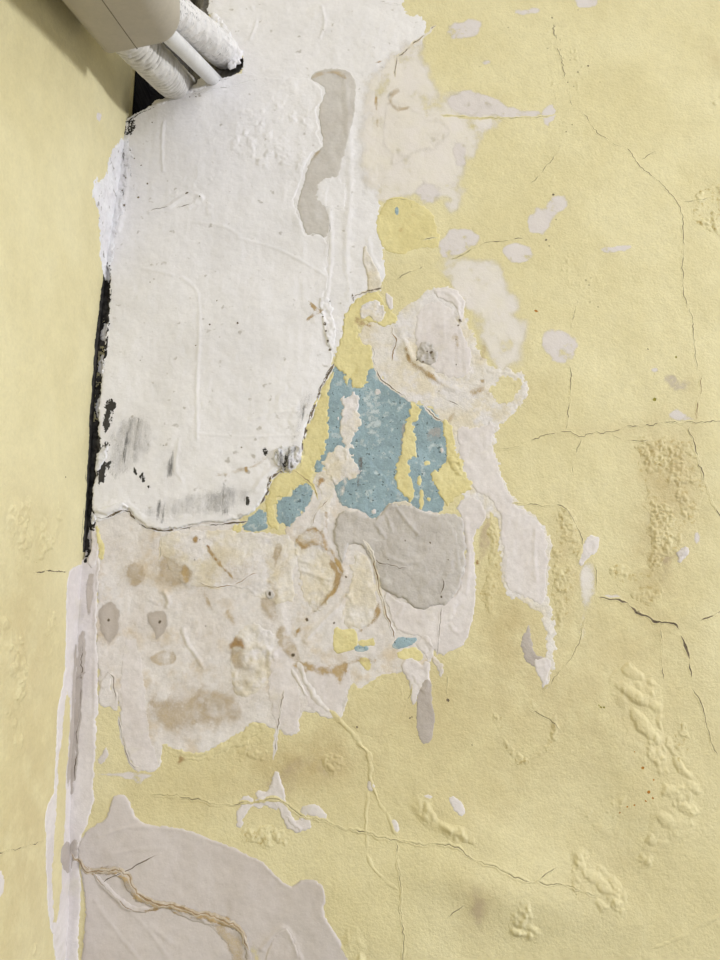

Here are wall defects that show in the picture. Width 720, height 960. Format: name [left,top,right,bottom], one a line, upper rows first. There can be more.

spalling [190,0,209,16]
spalling [125,72,165,129]
spalling [202,56,244,81]
peeling [376,197,440,254]
crack [440,17,720,518]
peeling [231,246,473,533]
peeling [86,526,105,568]
crack [512,502,720,756]
peeling [333,622,434,738]
crack [273,690,285,759]
peeling [236,771,327,833]
crack [71,853,249,951]